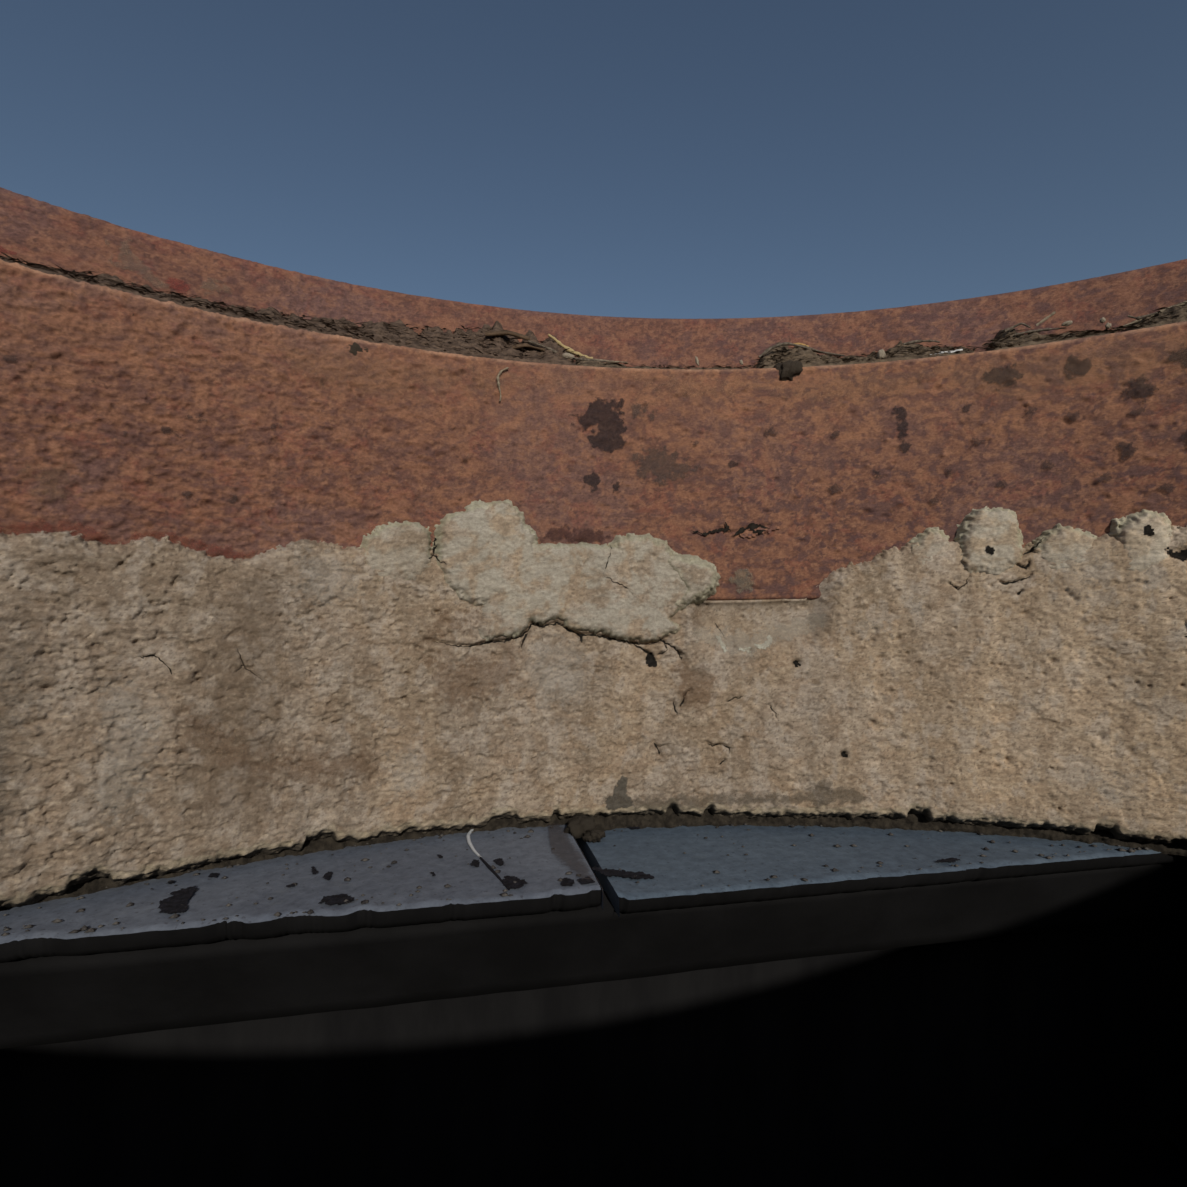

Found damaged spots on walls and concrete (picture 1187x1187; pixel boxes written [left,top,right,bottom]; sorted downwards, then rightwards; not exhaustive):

corrosion [981,363,1024,391]
corrosion [1064,355,1092,378]
corrosion [1121,375,1159,414]
corrosion [572,398,627,453]
corrosion [891,406,912,453]
corrosion [1116,442,1138,461]
corrosion [583,472,620,493]
corrosion [540,524,611,544]
corrosion [692,522,780,538]
peeling [477,542,721,643]
crack [434,622,683,660]